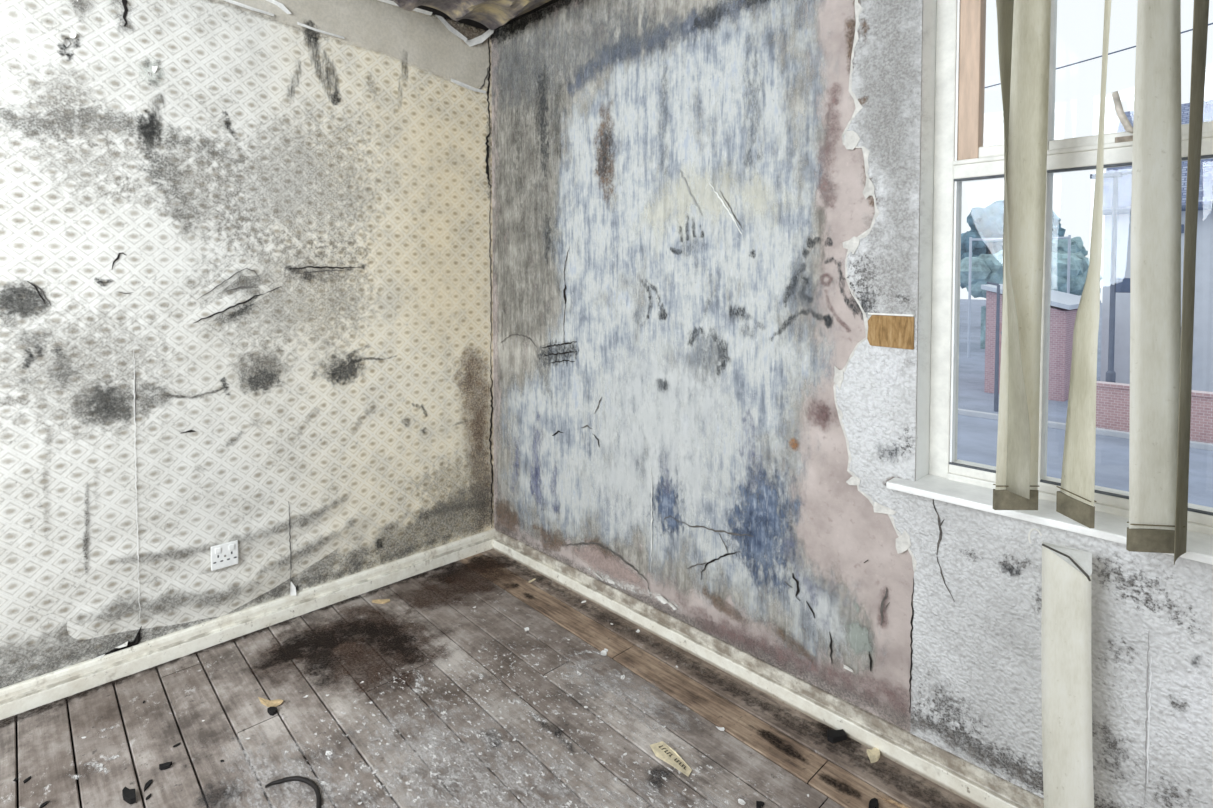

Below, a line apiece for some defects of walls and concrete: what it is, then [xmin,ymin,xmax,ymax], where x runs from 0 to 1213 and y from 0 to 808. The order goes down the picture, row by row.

peeling [223,0,345,39]
damp [212,0,583,105]
damp [0,96,212,219]
damp [595,108,613,198]
damp [0,281,51,318]
damp [850,255,876,314]
peeling [413,0,875,676]
damp [74,385,166,424]
peeling [873,502,897,515]
peeling [896,530,911,554]
crack [878,499,955,709]
damp [1095,557,1192,625]